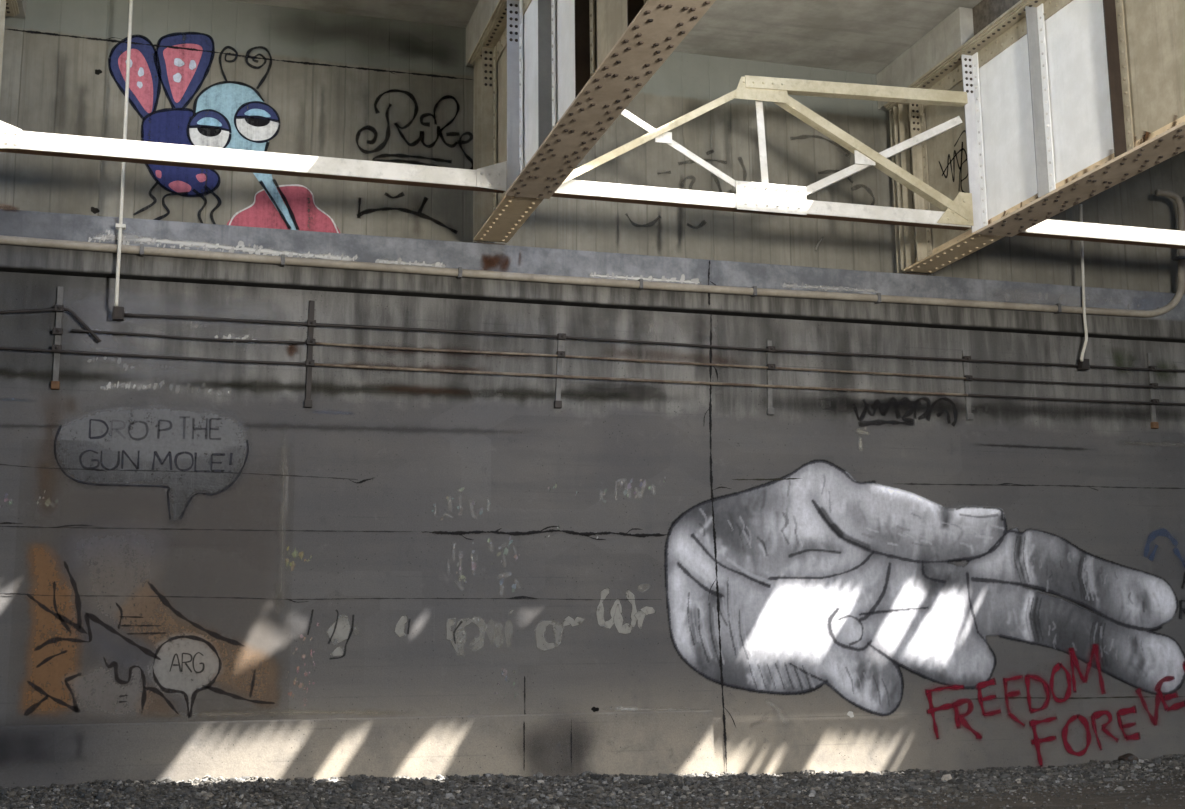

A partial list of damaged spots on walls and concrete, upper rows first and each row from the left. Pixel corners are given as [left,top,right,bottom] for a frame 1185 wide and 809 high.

rust [483,256,509,271]
water stain [222,382,646,400]
crack [0,522,671,540]